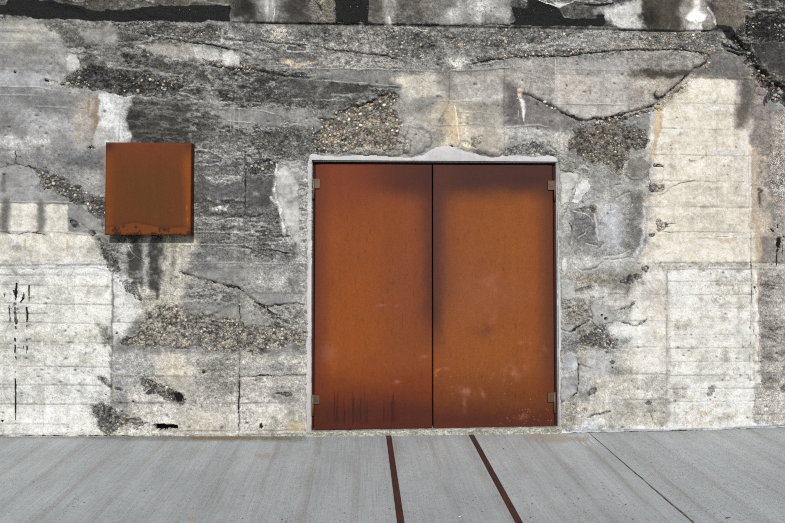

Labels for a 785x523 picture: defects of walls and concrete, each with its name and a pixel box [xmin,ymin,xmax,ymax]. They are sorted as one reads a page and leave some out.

spalling [245,92,401,175]
spalling [568,103,660,175]
crack [472,25,785,129]
damp [738,78,750,126]
damp [117,235,163,299]
spalling [115,304,312,356]
crack [179,270,295,326]
crack [216,356,291,437]